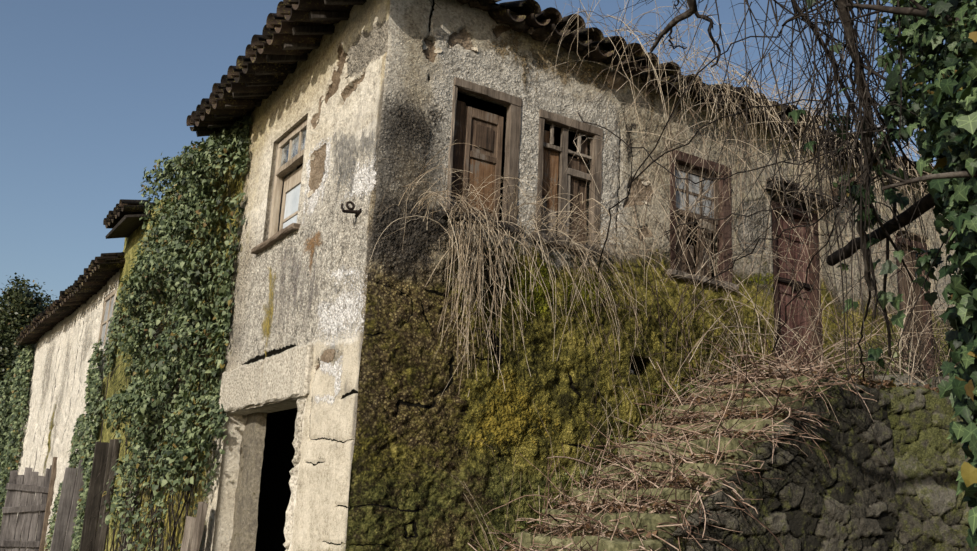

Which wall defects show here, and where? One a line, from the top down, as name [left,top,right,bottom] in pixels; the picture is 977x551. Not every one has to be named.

crack [427,0,440,38]
flaking render [421,27,478,62]
flaking render [311,19,389,129]
peeling [307,143,326,198]
water stain [264,248,367,356]
crack [242,344,296,365]
crack [341,389,358,399]
crack [306,391,354,466]